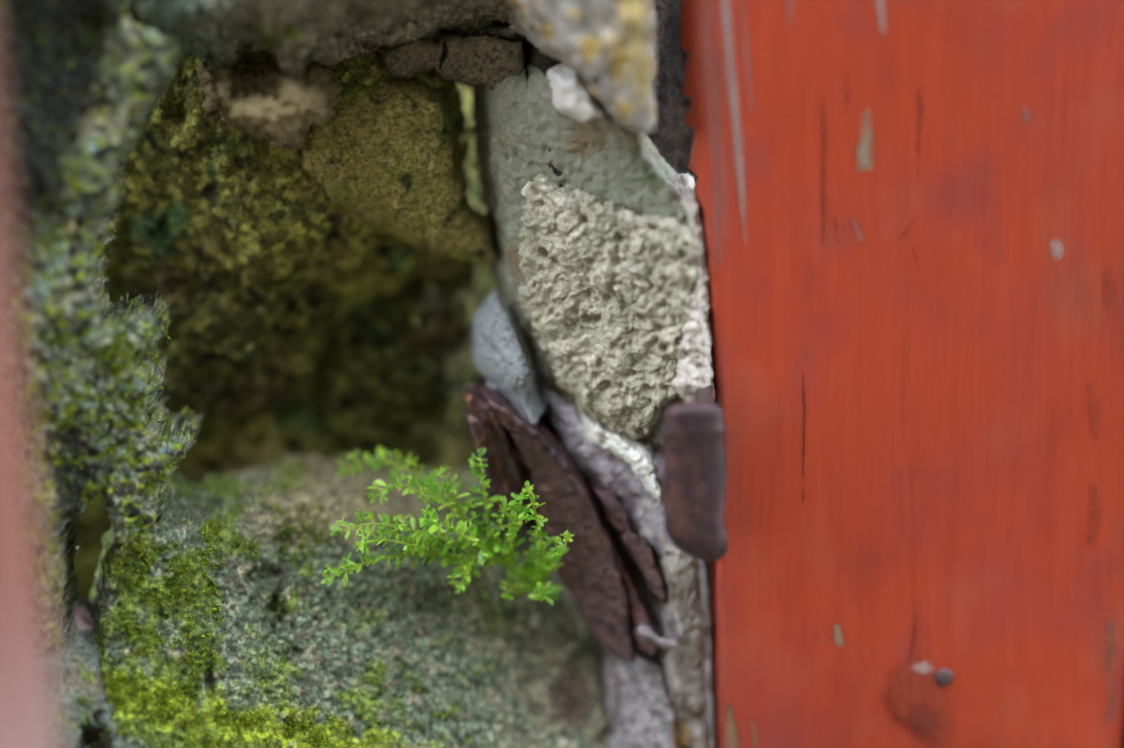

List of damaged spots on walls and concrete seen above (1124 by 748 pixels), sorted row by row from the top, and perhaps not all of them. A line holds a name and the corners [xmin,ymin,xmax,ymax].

peeling [705,0,752,225]
peeling [857,112,871,169]